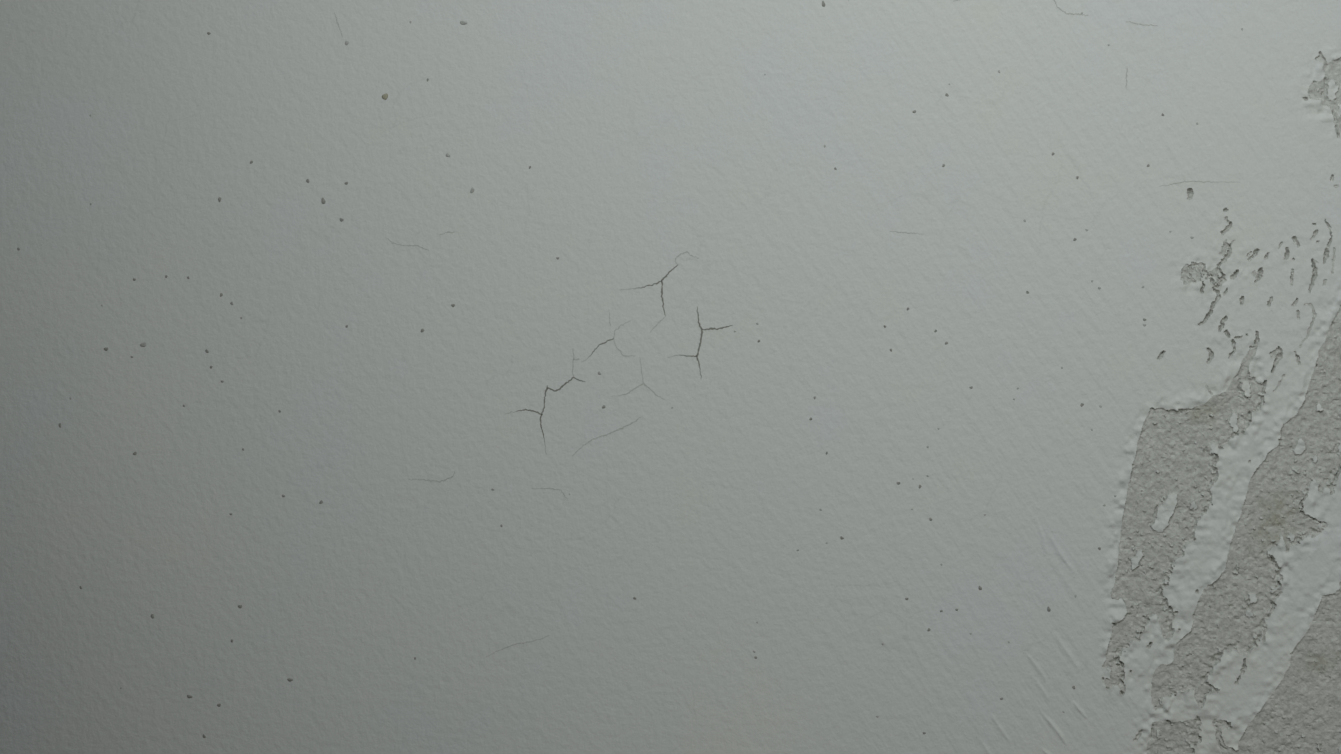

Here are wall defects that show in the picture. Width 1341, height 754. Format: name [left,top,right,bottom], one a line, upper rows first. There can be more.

peeling [1303,51,1341,138]
crack [506,251,733,455]
peeling [1102,208,1341,754]